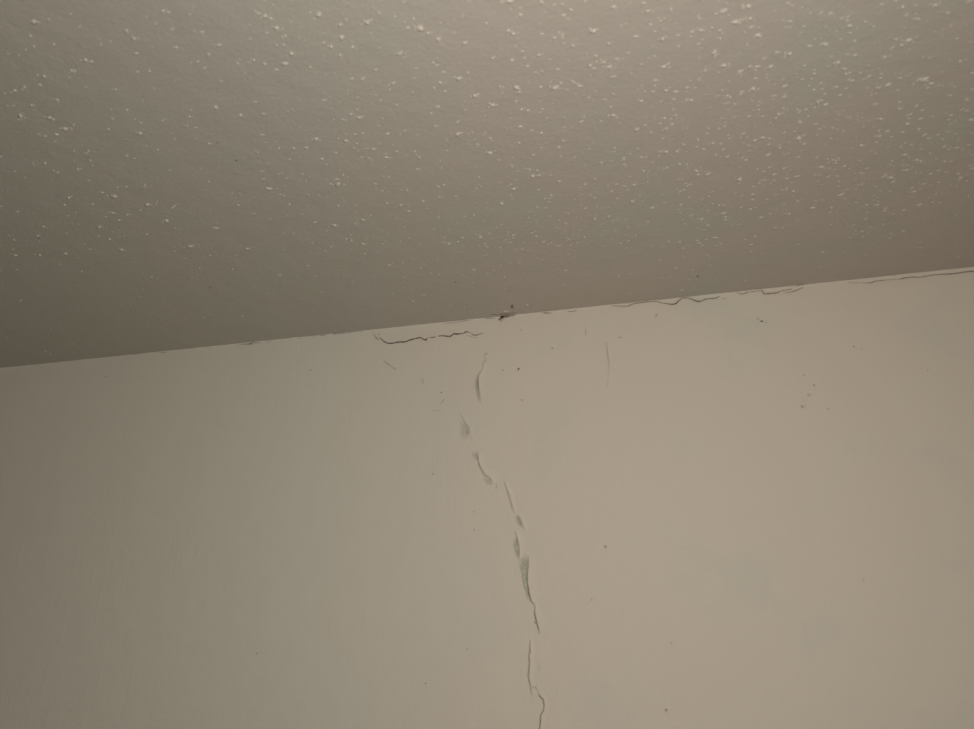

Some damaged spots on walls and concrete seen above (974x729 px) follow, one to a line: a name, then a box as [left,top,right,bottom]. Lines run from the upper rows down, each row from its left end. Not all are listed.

crack [616,296,718,306]
crack [374,328,479,344]
crack [460,361,549,729]